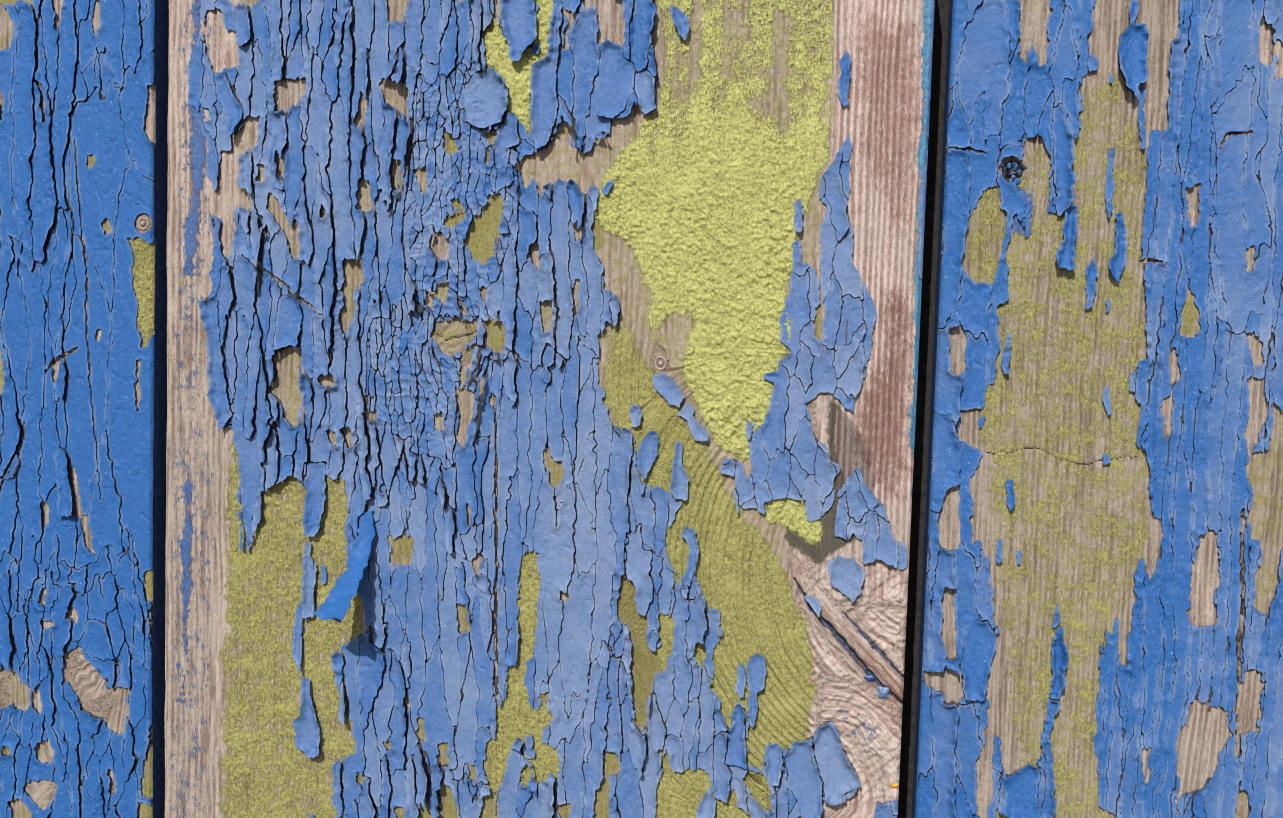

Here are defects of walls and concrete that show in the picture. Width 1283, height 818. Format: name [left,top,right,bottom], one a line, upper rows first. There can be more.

crack [52,146,91,369]
peeling [0,0,935,818]
crack [493,409,501,718]
peeling [915,0,1283,818]
crack [1220,131,1253,149]
crack [1235,515,1244,744]